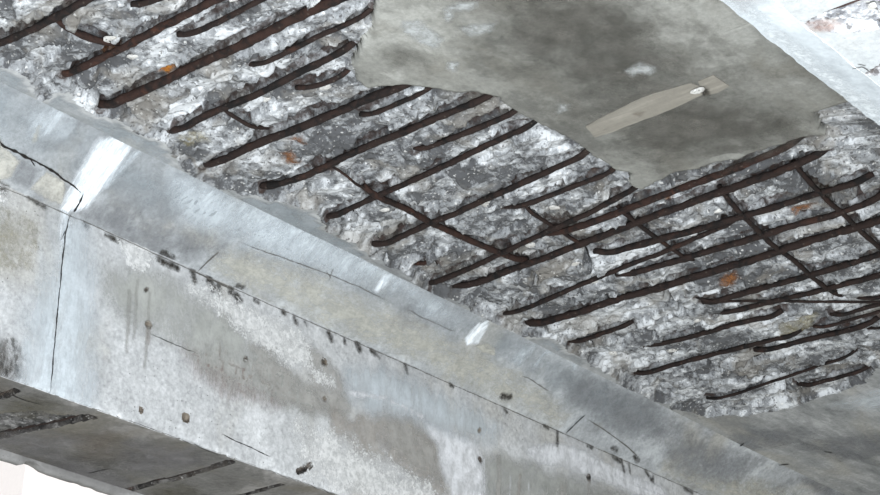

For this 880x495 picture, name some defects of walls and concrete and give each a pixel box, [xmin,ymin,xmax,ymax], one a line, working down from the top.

spalling [0,0,94,47]
spalling [56,0,225,77]
spalling [97,0,350,109]
spalling [169,41,358,134]
spalling [203,85,412,168]
spalling [249,7,374,67]
spalling [259,94,585,225]
spalling [371,148,632,250]
spalling [429,102,880,289]
water stain [0,122,397,402]
crack [0,142,702,495]
spalling [503,215,880,329]